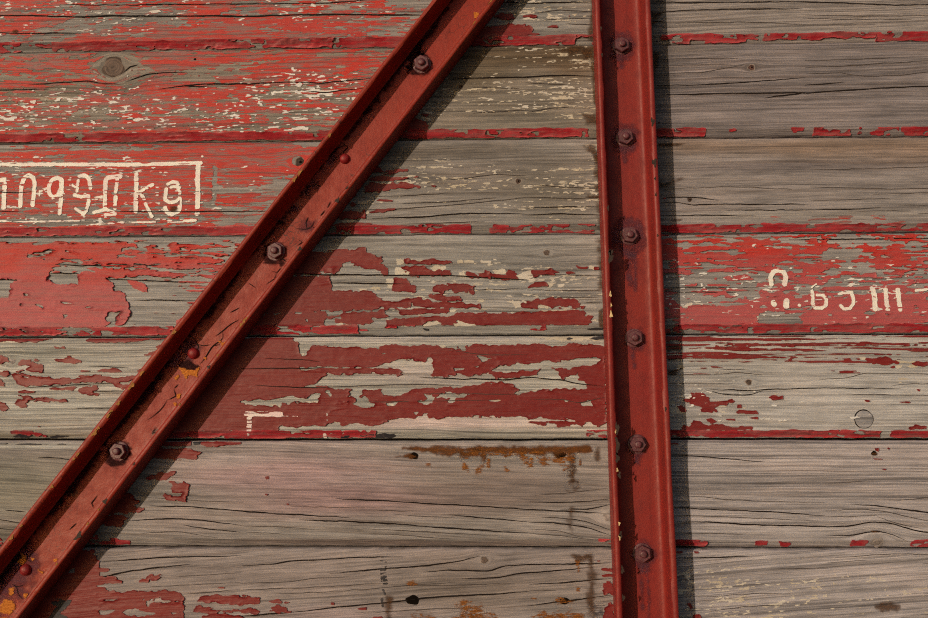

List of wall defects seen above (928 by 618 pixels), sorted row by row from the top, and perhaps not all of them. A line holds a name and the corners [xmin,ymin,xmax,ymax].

peeling [471,12,593,47]
peeling [400,114,588,139]
peeling [0,0,426,411]
peeling [325,166,471,235]
peeling [489,223,595,234]
rust [0,0,453,614]
peeling [661,215,928,374]
peeling [146,247,607,502]
rust [402,445,599,482]
peeling [102,492,144,527]
peeling [30,534,292,618]
peeling [597,560,614,618]